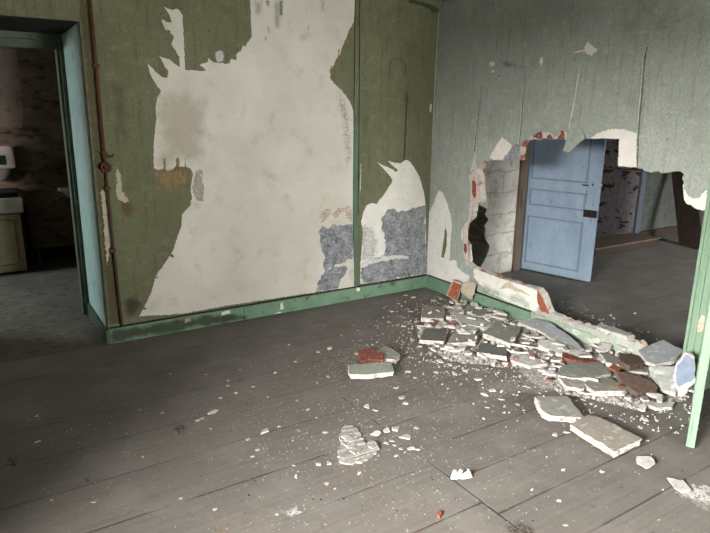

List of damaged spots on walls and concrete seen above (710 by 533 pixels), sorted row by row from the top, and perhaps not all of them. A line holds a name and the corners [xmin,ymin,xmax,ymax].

flaking render [574,42,597,56]
crack [636,47,649,166]
peeling [140,0,549,323]
flaking render [528,130,567,140]
flaking render [591,128,638,168]
peeling [115,169,129,203]
flaking render [683,184,707,210]
peeling [100,189,112,264]